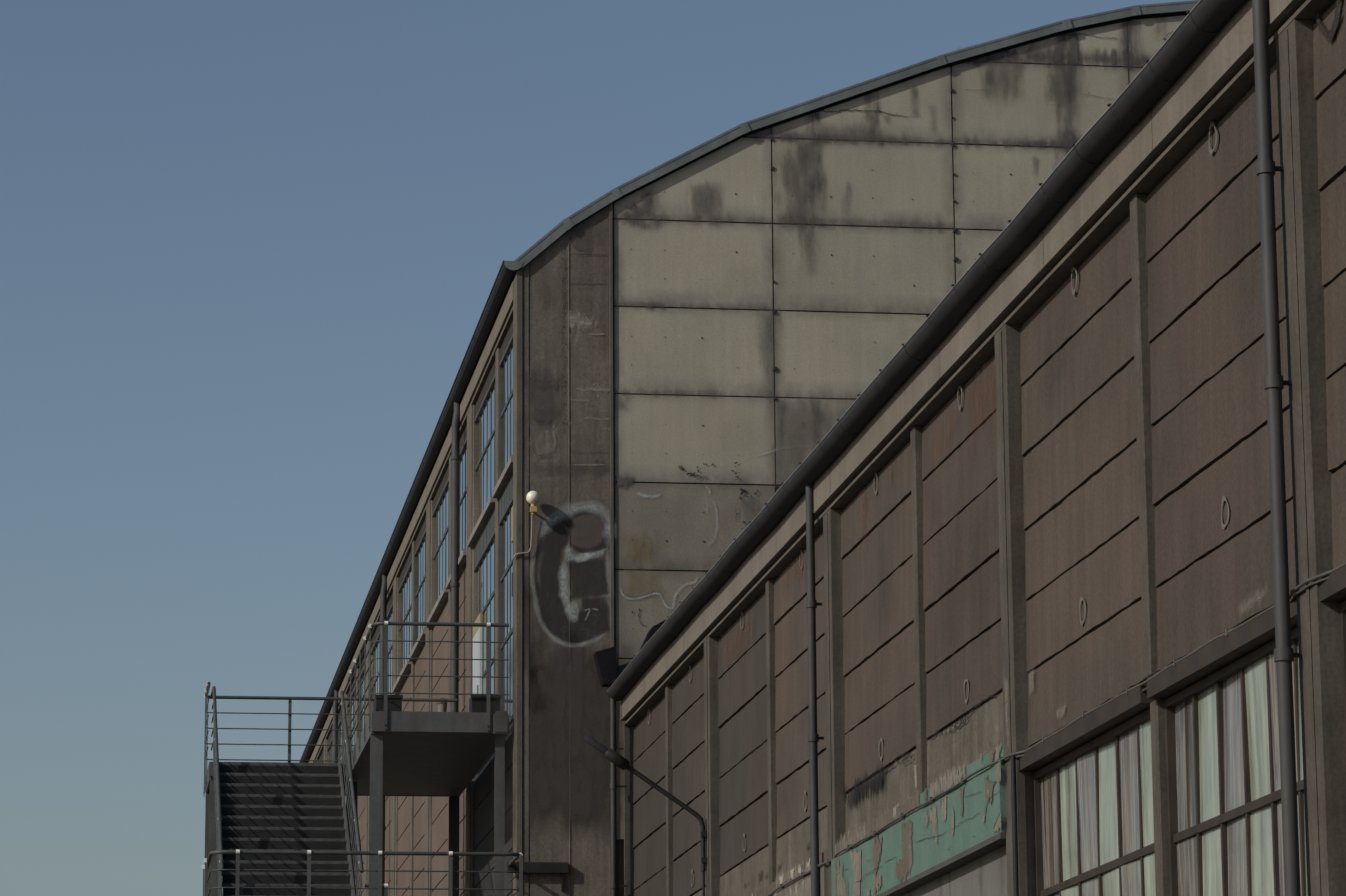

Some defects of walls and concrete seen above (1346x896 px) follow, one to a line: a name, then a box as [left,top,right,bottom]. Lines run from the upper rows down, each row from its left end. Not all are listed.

damp [753,112,919,198]
damp [968,21,1148,169]
peeling [776,858,811,896]
peeling [835,763,966,896]